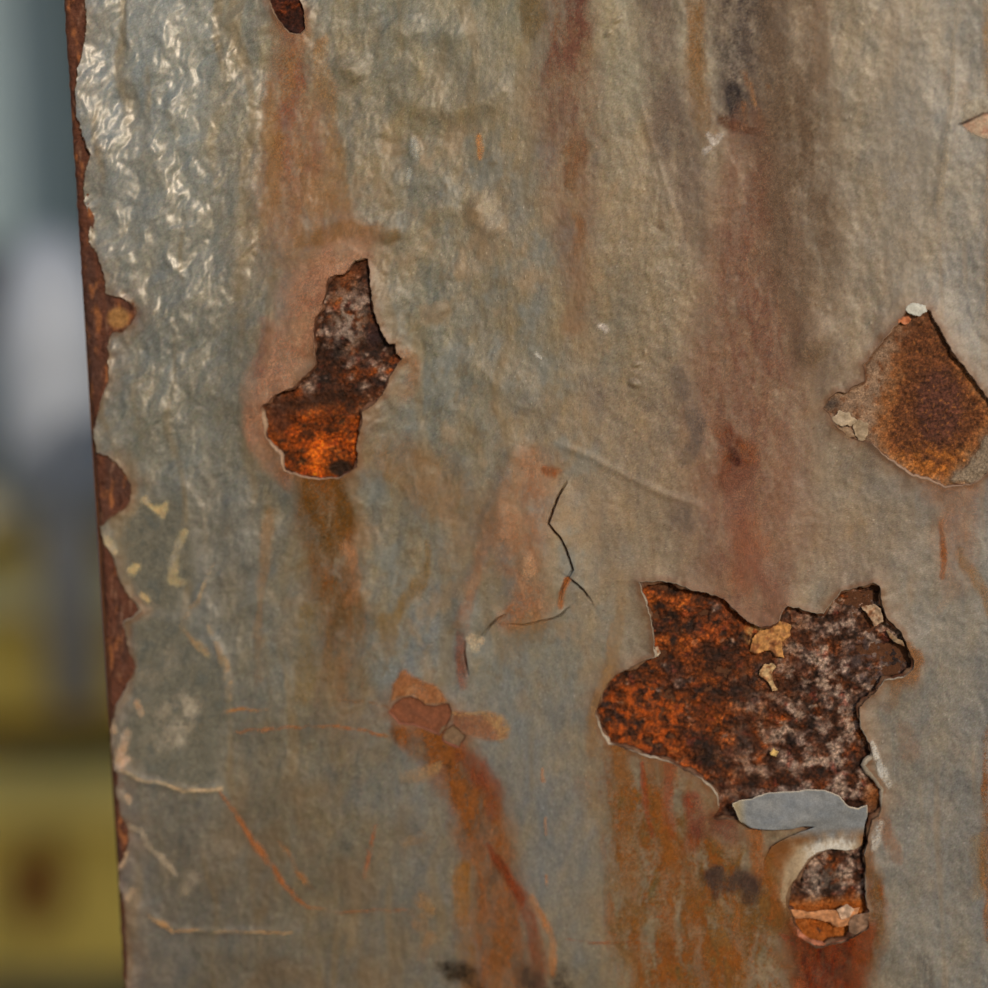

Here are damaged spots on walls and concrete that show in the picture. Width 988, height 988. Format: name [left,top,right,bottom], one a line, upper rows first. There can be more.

peeling [268,0,306,35]
rust [688,1,703,107]
peeling [960,97,988,138]
peeling [260,258,403,480]
peeling [823,303,988,488]
rust [64,0,142,988]
crack [464,484,591,667]
peeling [388,670,509,748]
peeling [595,580,915,948]
rust [7,844,67,924]
rust [392,727,547,988]
rust [608,745,885,988]